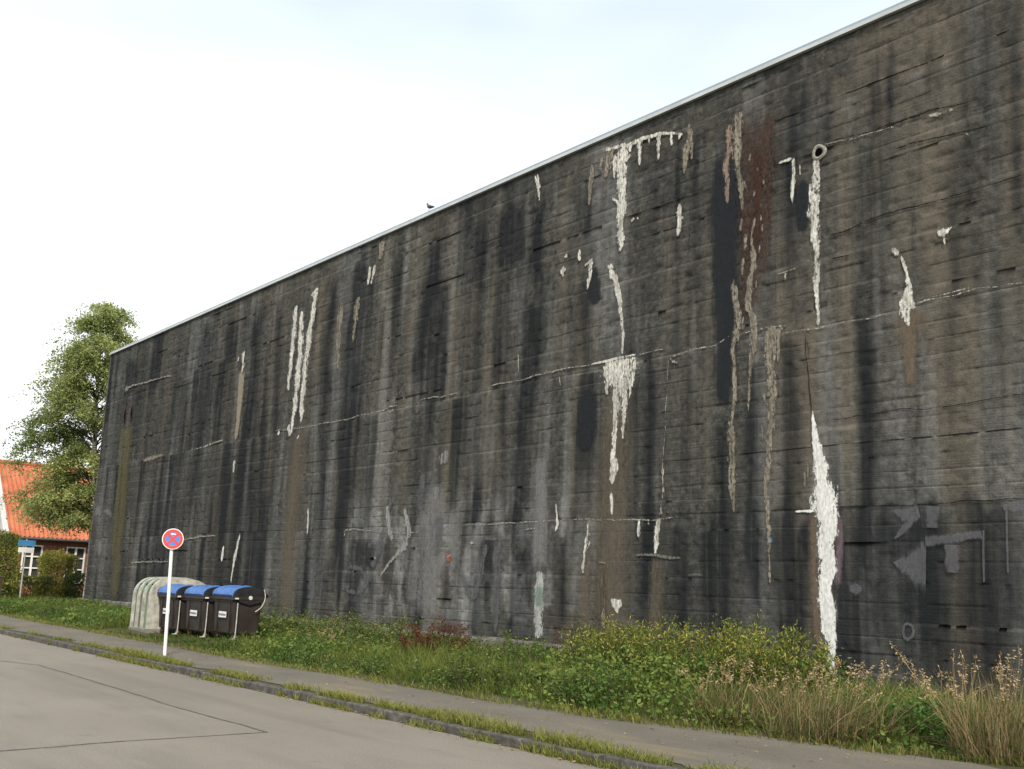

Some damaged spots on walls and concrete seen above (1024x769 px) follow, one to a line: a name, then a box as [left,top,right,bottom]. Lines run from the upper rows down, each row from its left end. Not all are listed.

crack [275,393,456,431]
crack [463,313,1022,544]
damp [707,111,781,583]
corrosion [738,115,780,311]
crack [917,282,1021,303]
peeling [533,571,546,638]
peeling [795,412,840,677]